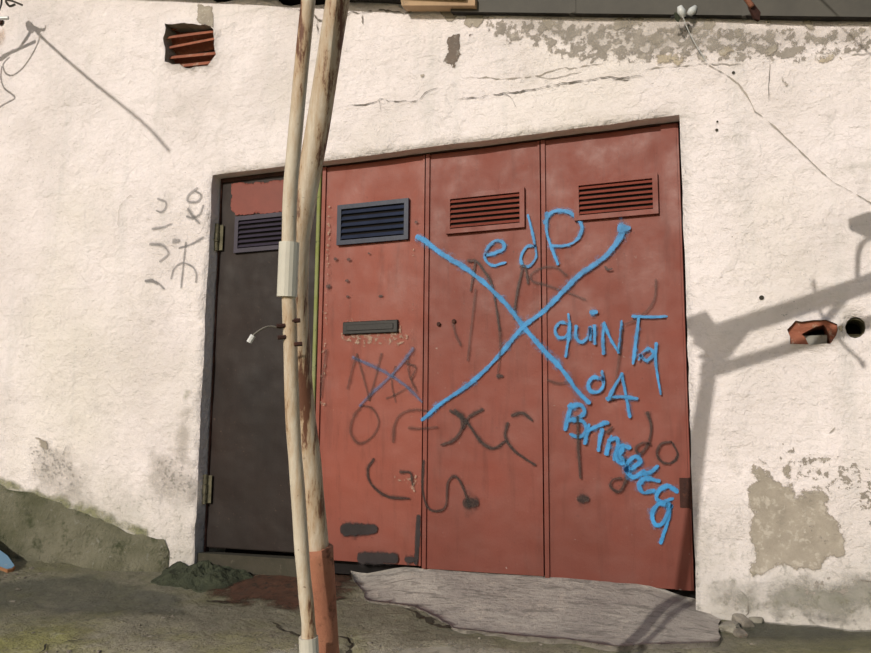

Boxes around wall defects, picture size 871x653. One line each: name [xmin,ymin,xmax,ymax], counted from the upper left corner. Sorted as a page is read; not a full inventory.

crack [347,9,412,24]
peeling [441,12,871,74]
crack [460,60,871,203]
spalling [747,444,871,595]